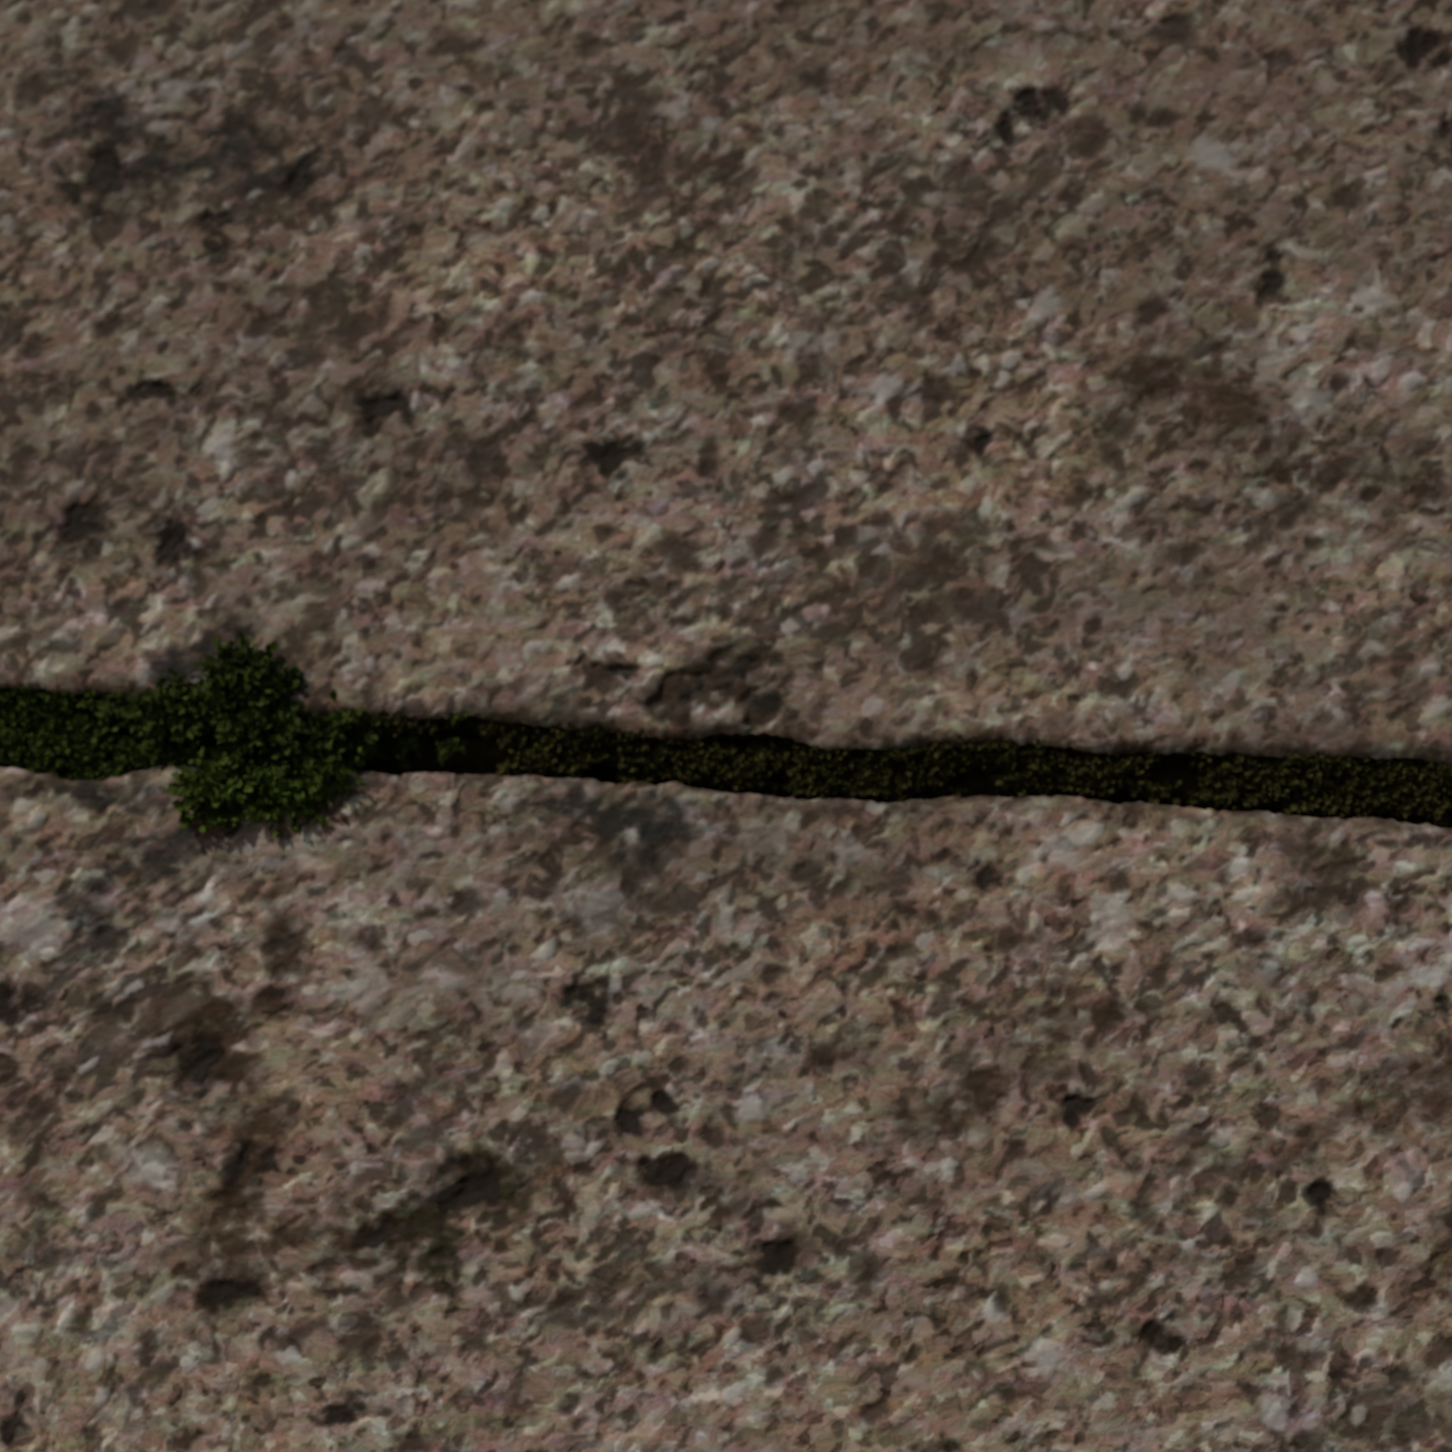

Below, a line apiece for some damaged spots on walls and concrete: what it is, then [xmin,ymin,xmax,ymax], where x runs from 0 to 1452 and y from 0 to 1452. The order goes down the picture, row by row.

crack [0,682,1452,829]